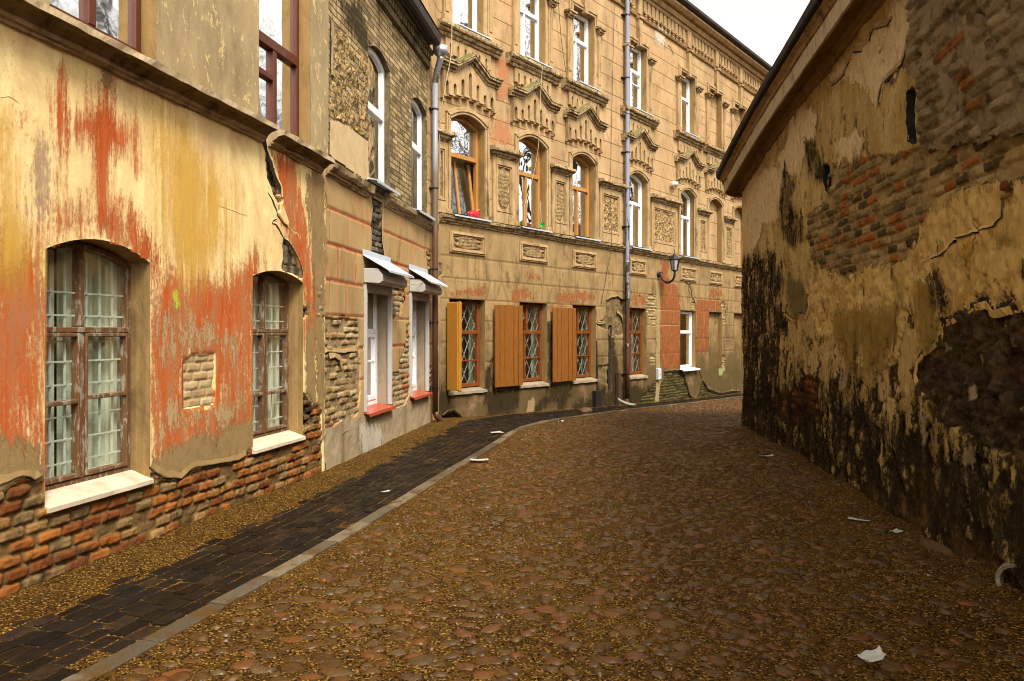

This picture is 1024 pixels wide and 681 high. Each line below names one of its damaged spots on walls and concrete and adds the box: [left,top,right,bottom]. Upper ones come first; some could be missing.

crack [262,139,303,272]
spalling [331,28,369,139]
flaking render [806,0,1024,281]
crack [922,195,1002,262]
flaking render [0,108,361,598]
leakage [741,159,1024,593]
spalling [909,299,1024,451]